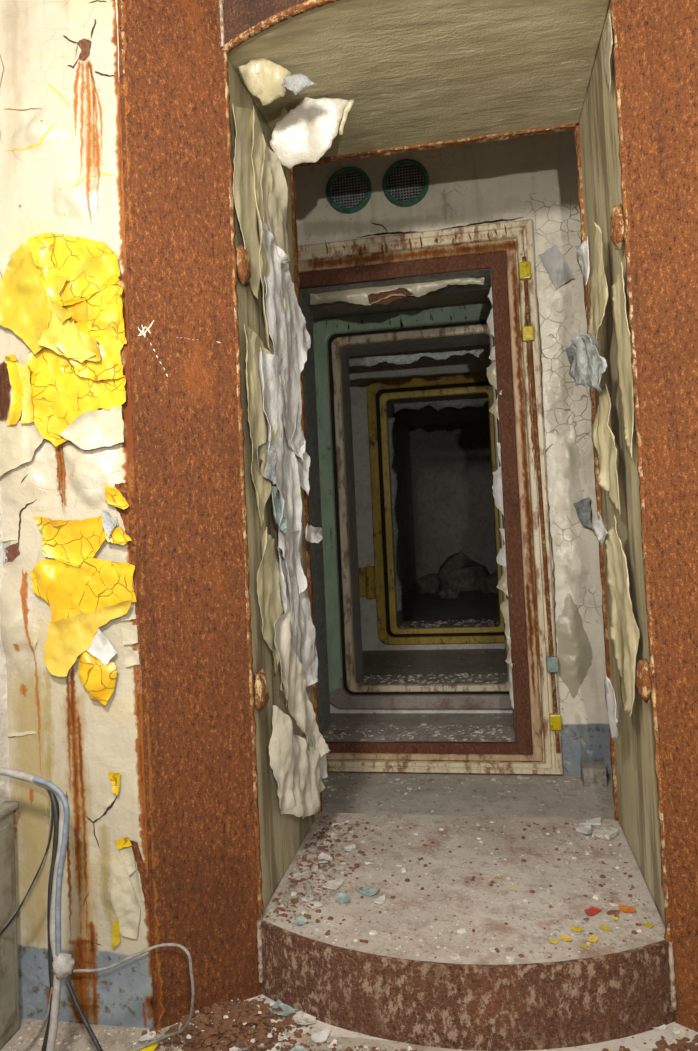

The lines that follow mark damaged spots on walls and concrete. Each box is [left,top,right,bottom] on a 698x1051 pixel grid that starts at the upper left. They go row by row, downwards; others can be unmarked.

corrosion [73,61,102,218]
peeling [604,13,613,94]
peeling [0,233,127,478]
peeling [2,477,142,706]
corrosion [111,0,165,1030]
peeling [232,58,502,819]
peeling [492,443,504,516]
peeling [496,528,514,709]
peeling [538,221,640,742]